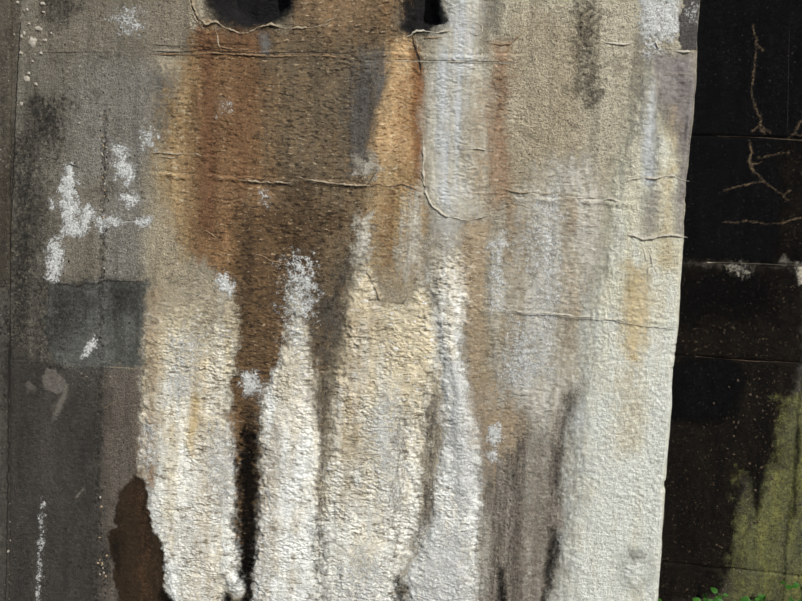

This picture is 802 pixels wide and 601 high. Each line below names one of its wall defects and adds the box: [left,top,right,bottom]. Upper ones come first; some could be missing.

water stain [110,5,145,36]
spalling [189,0,338,52]
spalling [399,0,455,49]
crack [724,23,802,225]
water stain [94,214,121,235]
water stain [135,216,153,228]
water stain [215,272,237,299]
corrosion [158,0,428,546]